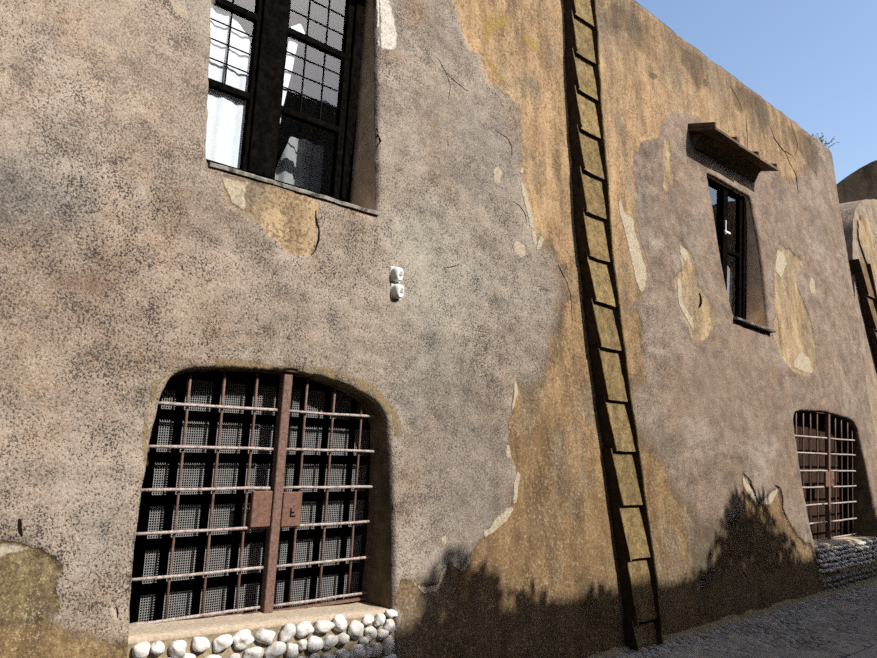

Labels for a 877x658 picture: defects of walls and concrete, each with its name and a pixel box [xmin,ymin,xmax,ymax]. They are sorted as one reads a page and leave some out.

peeling [377,0,397,50]
flaking render [221,175,319,256]
flaking render [596,0,817,385]
crack [768,123,799,192]
flaking render [394,0,625,658]
flaking render [638,429,820,636]
flaking render [0,540,128,658]